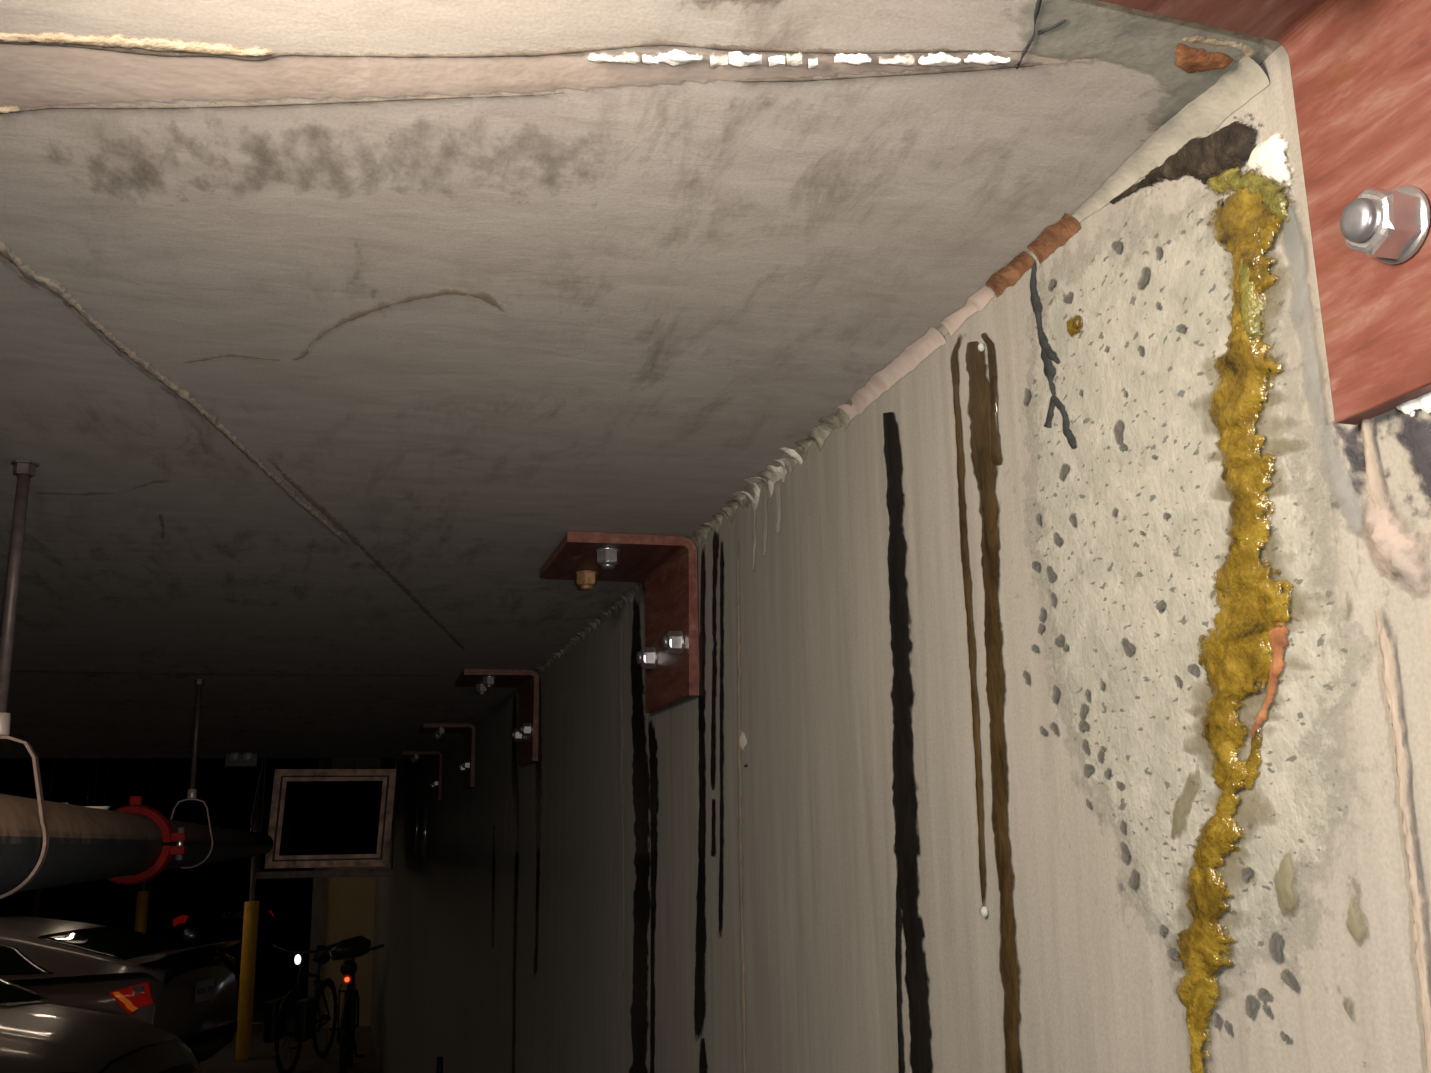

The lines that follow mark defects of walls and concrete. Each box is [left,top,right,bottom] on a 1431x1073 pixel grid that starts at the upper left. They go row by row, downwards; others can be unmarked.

crack [0,0,1066,82]
crack [0,92,563,114]
spalling [1110,114,1290,204]
corrosion [941,213,1081,336]
crack [1030,262,1077,449]
spalling [1114,420,1126,451]
peeling [1396,392,1431,416]
hole [1031,561,1068,652]
damp [883,412,932,1073]
hole [1079,681,1124,789]
damp [618,598,659,1073]
damp [694,531,747,1073]